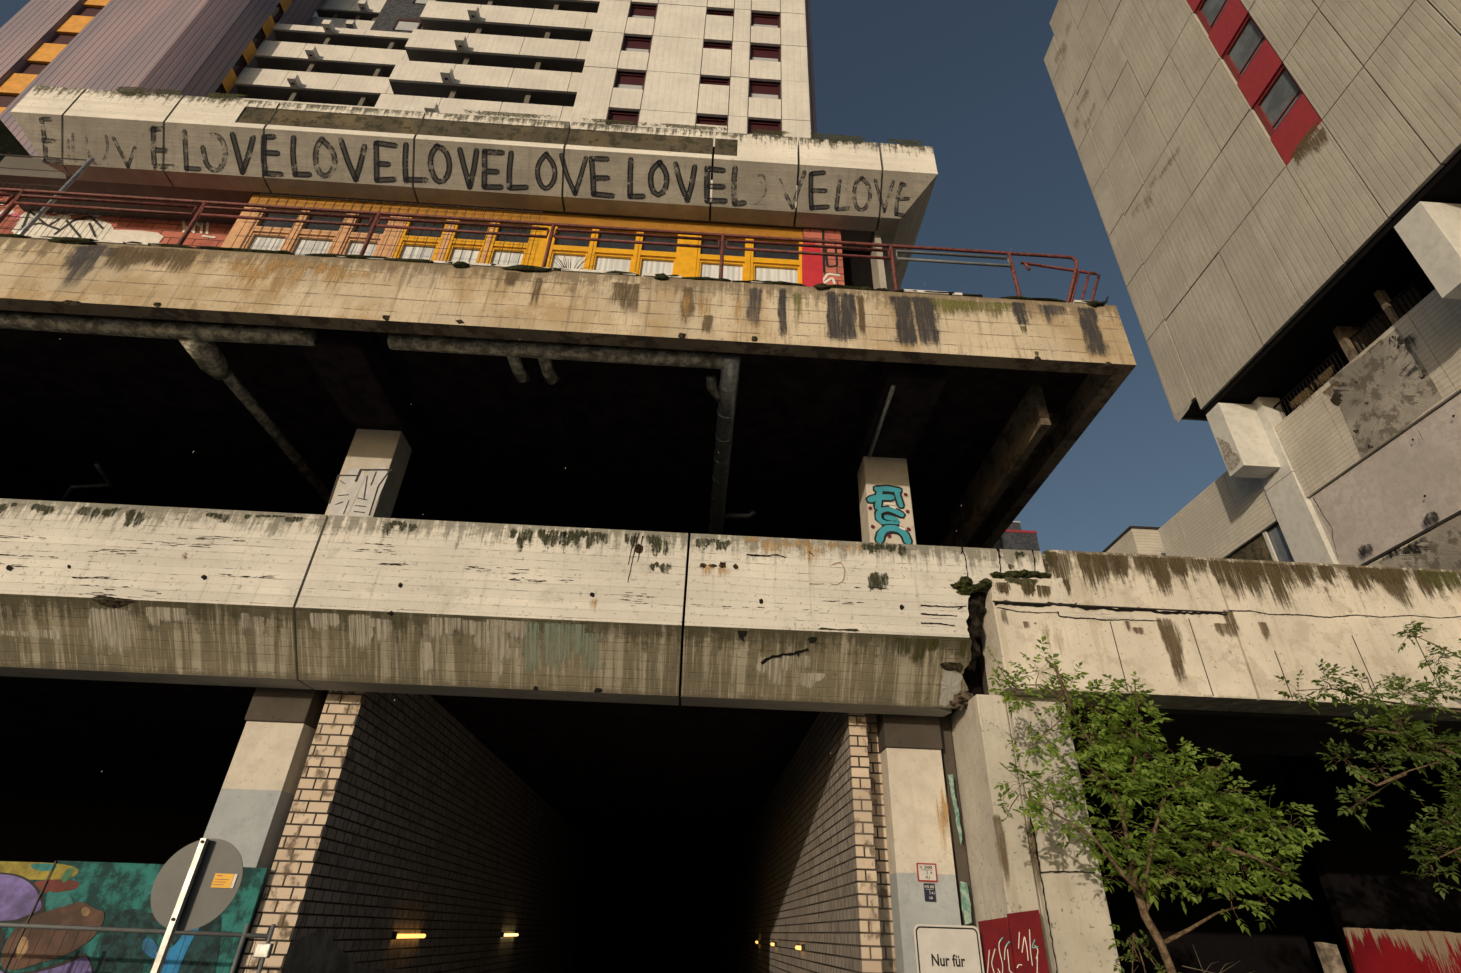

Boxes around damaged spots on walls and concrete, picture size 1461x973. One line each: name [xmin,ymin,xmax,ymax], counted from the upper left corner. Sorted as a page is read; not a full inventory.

damp [747,288,801,336]
damp [826,291,865,341]
damp [889,296,1109,356]
peeling [1329,328,1442,458]
damp [0,502,54,515]
damp [77,506,145,529]
damp [509,528,672,574]
crack [921,546,1461,626]
damp [996,511,1461,637]
peeling [1378,514,1461,570]
crack [760,648,808,665]
damp [1125,618,1183,679]